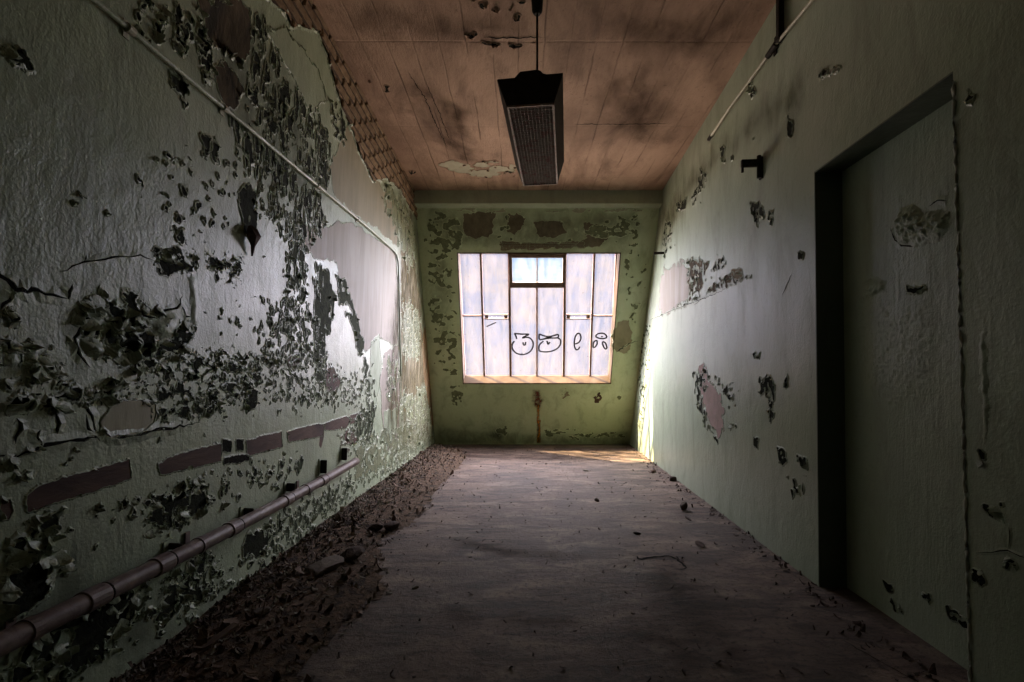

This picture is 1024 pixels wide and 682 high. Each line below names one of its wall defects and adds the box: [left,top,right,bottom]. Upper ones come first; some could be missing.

flaking render [658,167,752,317]
peeling [749,200,774,228]
crack [0,249,156,372]
flaking render [0,0,651,682]
rust [534,391,543,443]
flaking render [692,363,739,445]
peeling [758,373,789,424]
peeling [776,445,809,500]